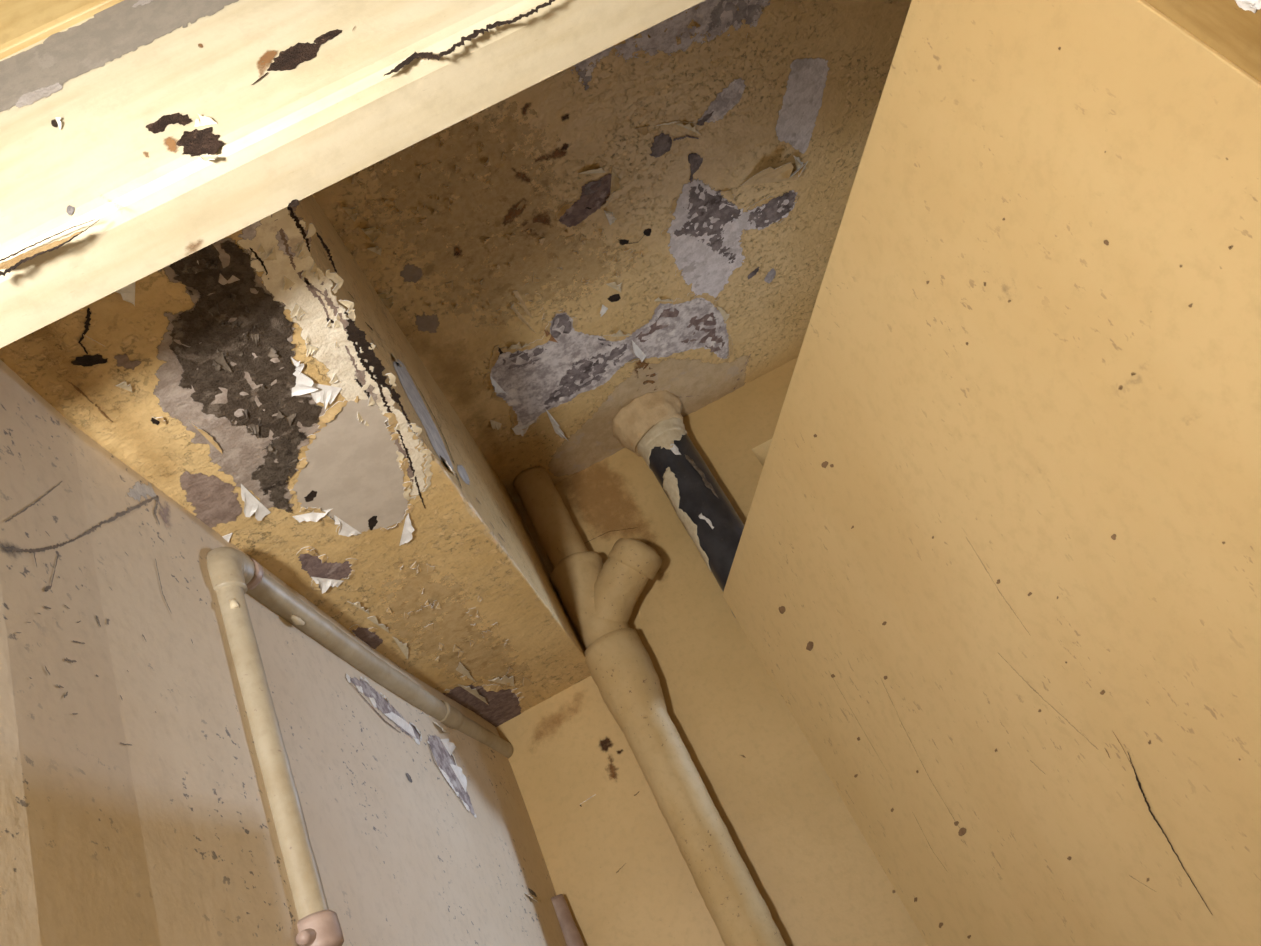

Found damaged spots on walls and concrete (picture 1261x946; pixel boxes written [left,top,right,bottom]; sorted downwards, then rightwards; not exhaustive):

peeling [0,0,238,112]
crack [384,0,555,76]
peeling [571,0,770,90]
peeling [775,58,829,172]
peeling [71,308,141,392]
flaking render [115,282,135,306]
flaking render [151,206,470,546]
crack [344,311,426,509]
flaking render [484,78,800,440]
peeling [345,673,477,818]
flaking render [443,662,525,727]
crack [1105,731,1212,914]